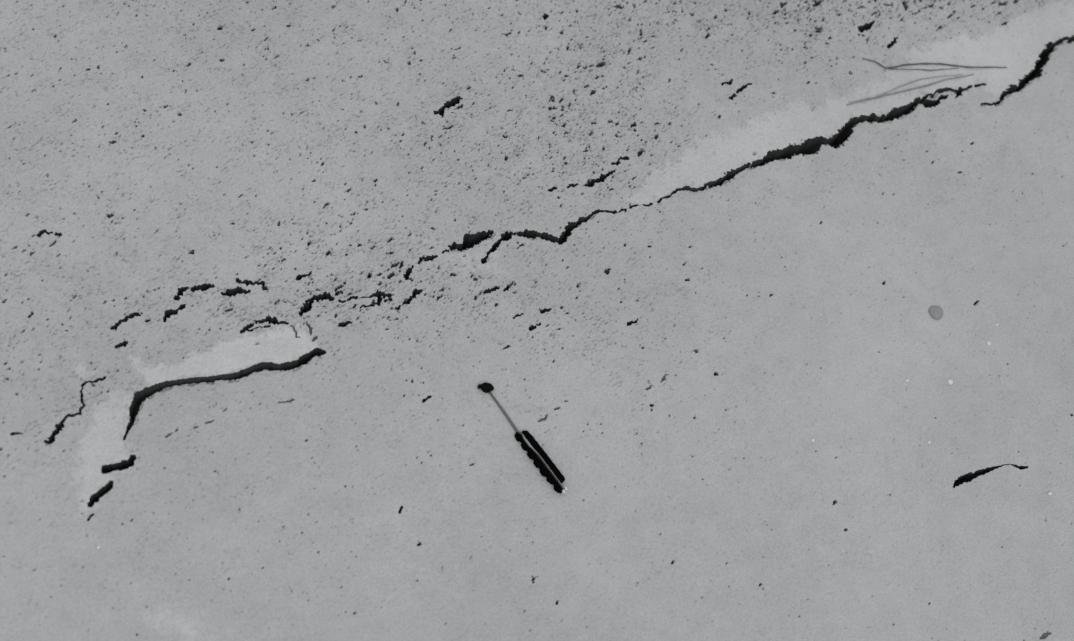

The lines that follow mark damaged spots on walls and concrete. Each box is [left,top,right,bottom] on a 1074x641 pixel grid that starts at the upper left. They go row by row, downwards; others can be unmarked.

crack [858,21,899,49]
crack [37,229,62,237]
crack [87,35,1074,521]
crack [10,376,106,444]